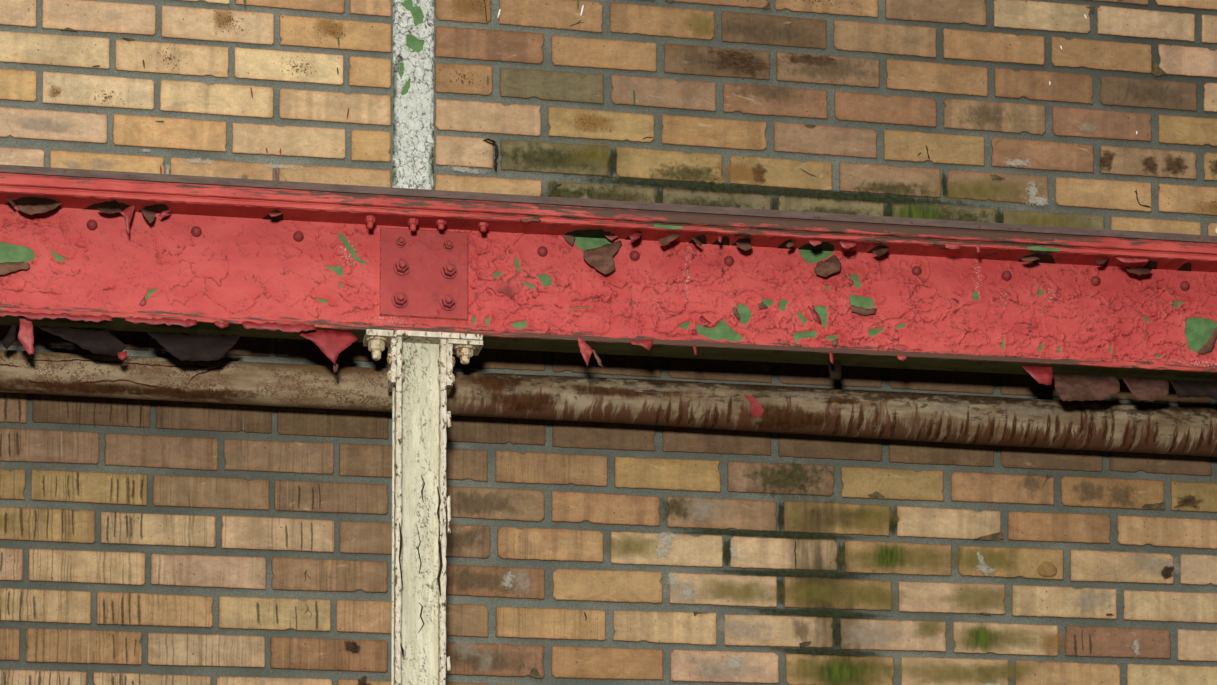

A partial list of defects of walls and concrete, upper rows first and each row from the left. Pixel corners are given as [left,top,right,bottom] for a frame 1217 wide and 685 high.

peeling [562,224,752,275]
peeling [777,239,906,337]
peeling [0,289,357,373]
peeling [678,299,842,380]
rust [474,377,552,410]
rust [575,385,732,428]
rust [757,398,896,437]
rust [916,407,1158,448]
peeling [1022,366,1169,401]
rust [1169,422,1217,452]
crack [399,476,443,655]
water stain [657,464,874,656]